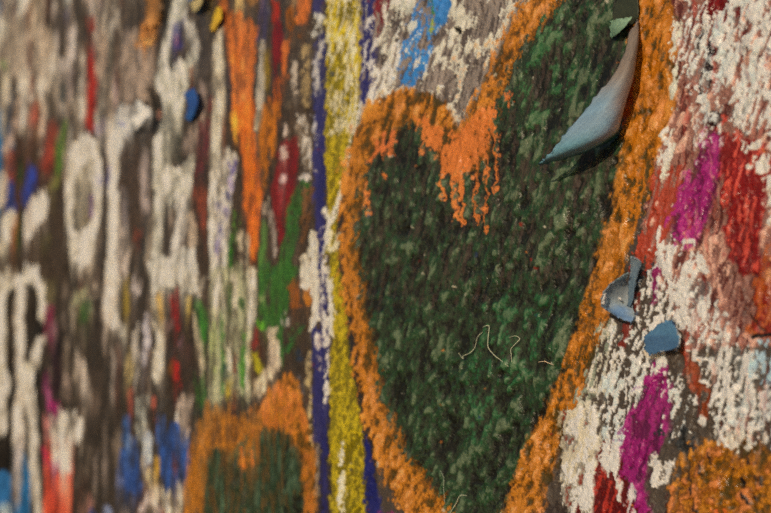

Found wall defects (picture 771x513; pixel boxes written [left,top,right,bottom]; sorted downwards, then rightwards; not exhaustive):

peeling [538,0,639,165]
peeling [600,256,645,324]
peeling [643,319,681,360]